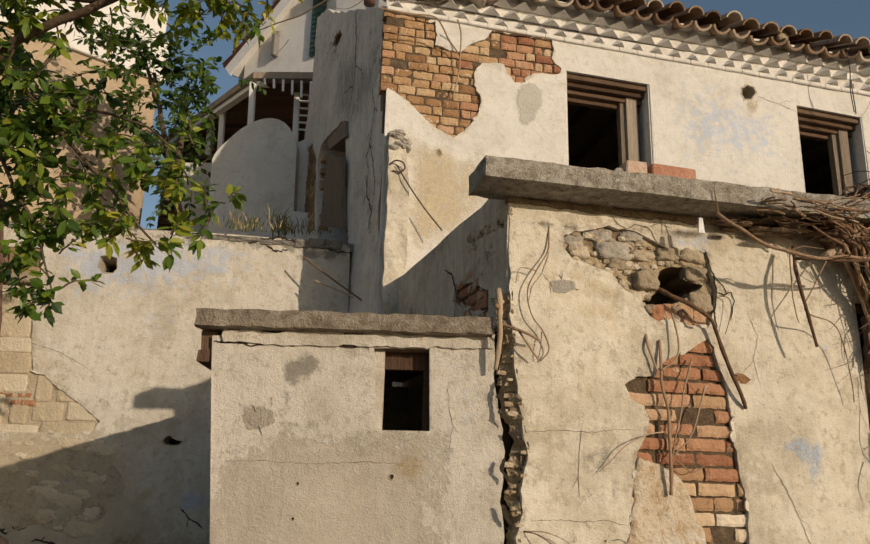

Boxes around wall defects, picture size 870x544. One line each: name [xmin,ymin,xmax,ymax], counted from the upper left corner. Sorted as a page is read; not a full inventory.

crack [342,29,377,230]
flaking render [379,0,561,138]
spalling [740,84,757,100]
flaking render [0,247,100,435]
water stain [285,356,318,384]
flaking render [454,271,488,317]
spalling [550,274,580,293]
spalling [562,228,714,328]
flaking render [625,341,751,544]